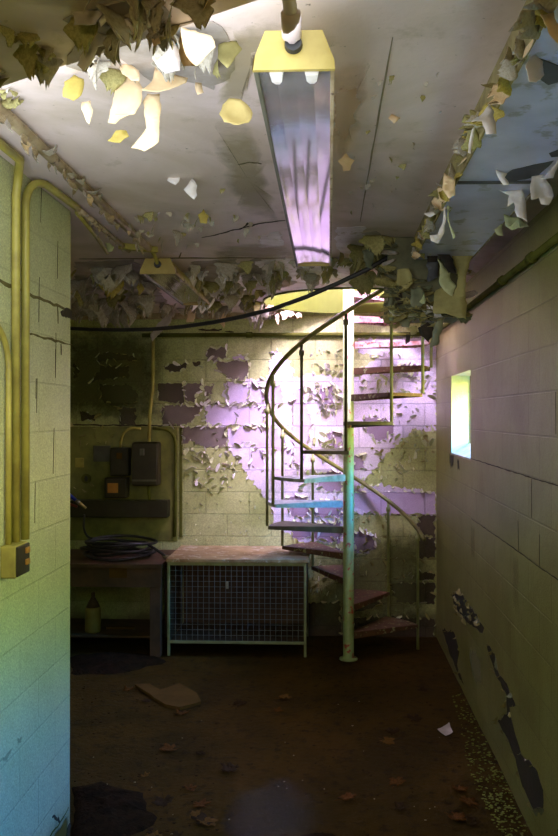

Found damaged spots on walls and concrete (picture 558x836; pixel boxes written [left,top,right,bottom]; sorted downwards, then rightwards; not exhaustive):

peeling [0,0,242,151]
crack [88,220,286,259]
peeling [70,0,558,685]
peeling [485,643,544,817]